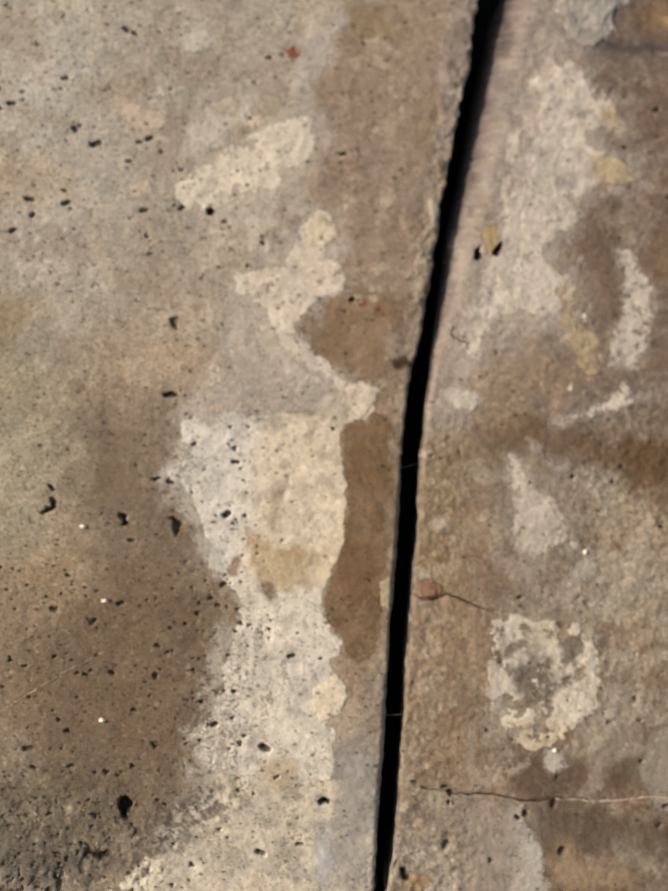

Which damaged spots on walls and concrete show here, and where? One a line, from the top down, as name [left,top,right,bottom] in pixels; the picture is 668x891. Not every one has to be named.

leakage [458,50,657,381]
leakage [304,261,414,388]
leakage [551,382,666,426]
leakage [229,557,239,575]
leakage [247,537,309,600]
leakage [325,412,398,662]
crack [413,586,494,611]
leakage [459,453,580,622]
leakage [119,738,380,891]
crack [423,787,668,802]